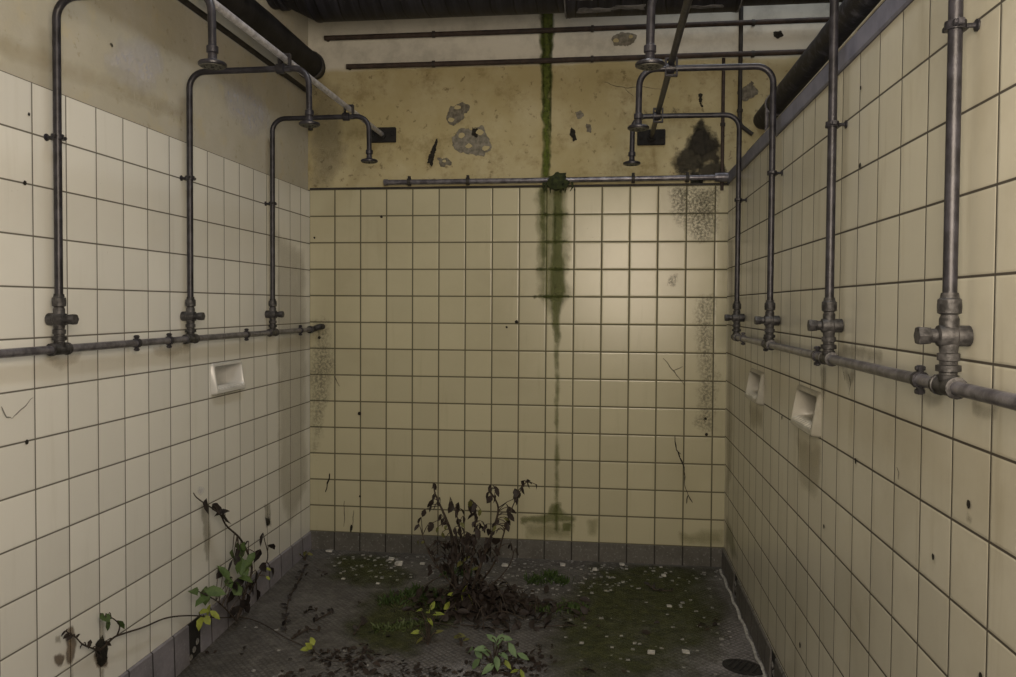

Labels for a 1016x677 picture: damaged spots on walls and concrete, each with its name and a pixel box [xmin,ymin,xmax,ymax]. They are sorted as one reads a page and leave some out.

leakage [543,15,552,132]
flaking render [427,102,492,167]
leakage [674,119,725,181]